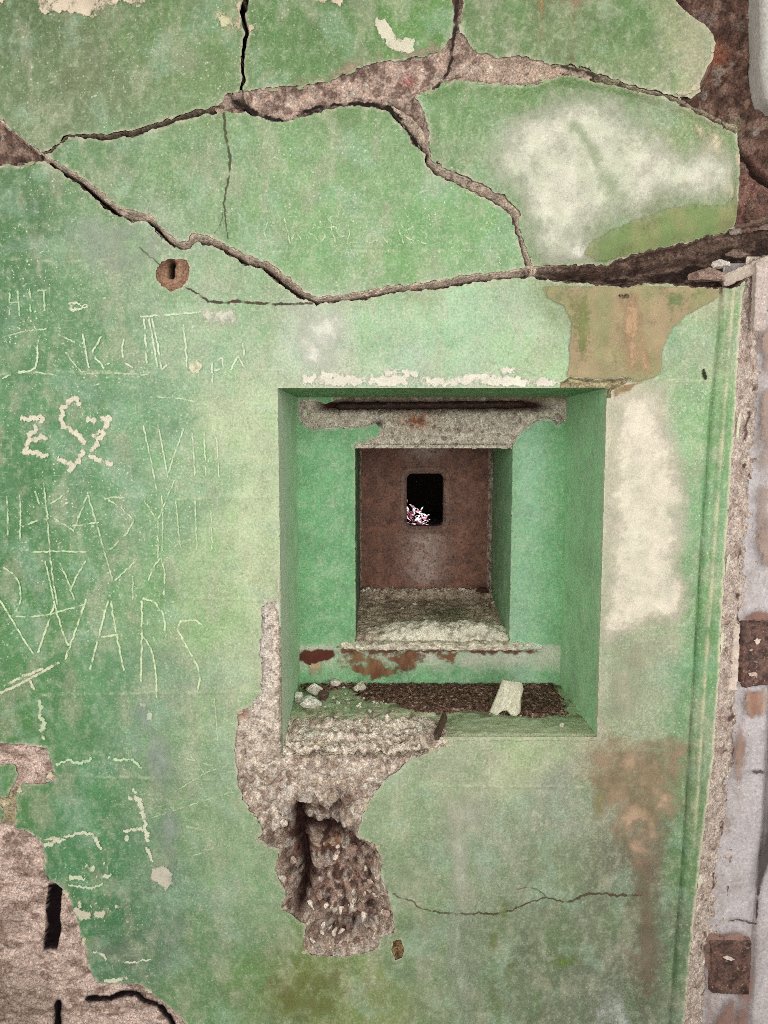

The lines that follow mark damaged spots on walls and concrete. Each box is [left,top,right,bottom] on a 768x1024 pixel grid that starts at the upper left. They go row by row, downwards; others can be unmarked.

crack [0,0,768,321]
spalling [215,0,600,156]
water stain [492,95,737,263]
spalling [673,0,768,235]
spalling [298,366,632,449]
water stain [542,285,720,642]
spalling [0,700,185,1024]
spalling [234,572,453,960]
rust [299,646,456,683]
crack [392,887,642,916]
water stain [595,994,630,1024]
spalling [684,277,765,1024]